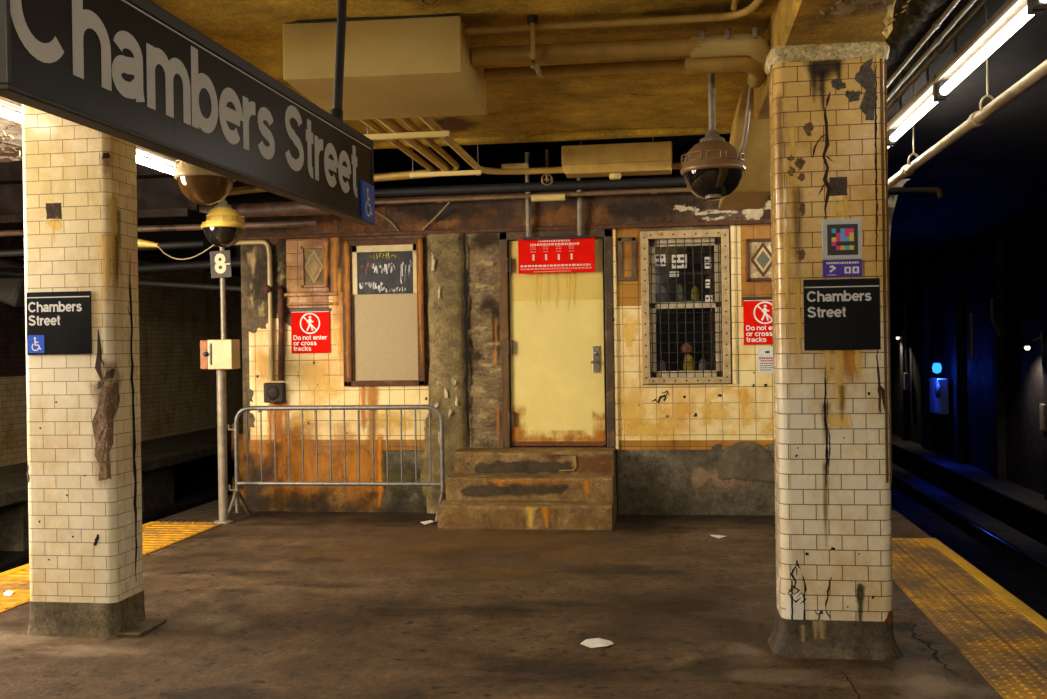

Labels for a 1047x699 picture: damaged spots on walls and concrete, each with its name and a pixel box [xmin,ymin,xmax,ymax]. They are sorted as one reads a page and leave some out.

damp [810,59,841,105]
spalling [831,57,878,121]
spalling [803,122,814,136]
peeling [674,200,771,221]
spalling [787,155,805,181]
crack [812,92,834,219]
peeling [829,177,847,196]
corrosion [823,350,859,429]
spalling [92,368,120,481]
corrosion [249,386,383,507]
crack [814,577,832,620]
crack [902,624,958,675]